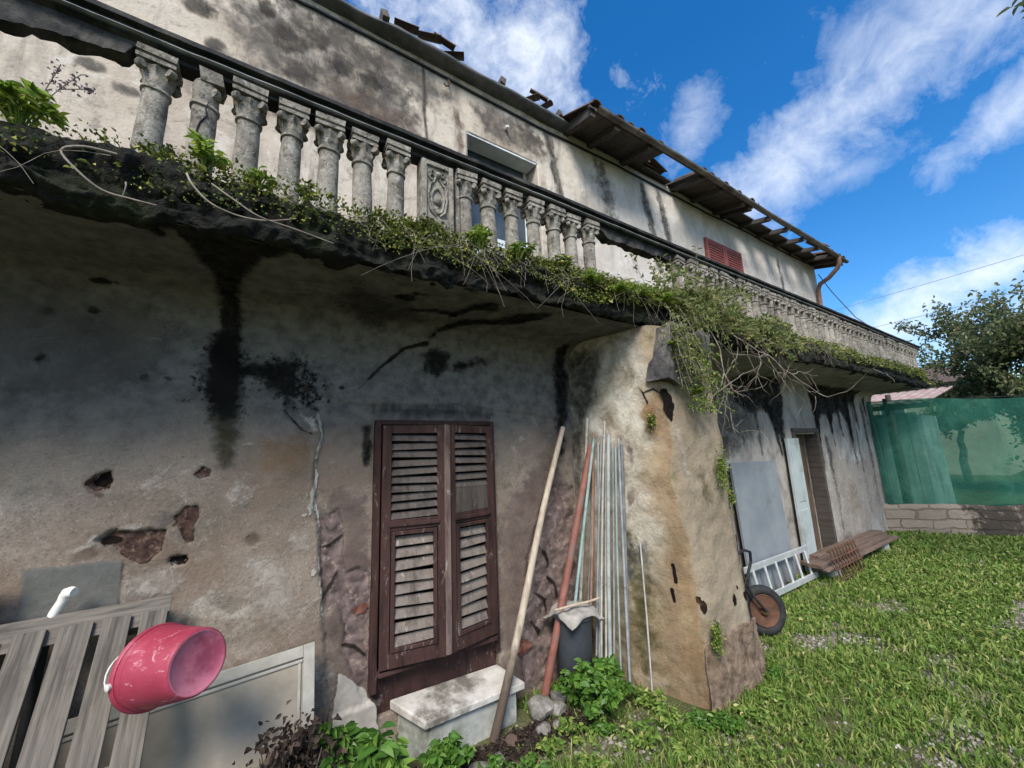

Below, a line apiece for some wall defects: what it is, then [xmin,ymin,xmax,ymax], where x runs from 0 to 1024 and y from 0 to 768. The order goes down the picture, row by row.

leakage [184,0,216,17]
leakage [232,0,448,135]
leakage [640,183,671,242]
leakage [150,222,333,466]
spalling [85,471,113,495]
spalling [73,505,199,563]
peeling [243,556,292,623]
crack [287,413,324,623]
peeling [289,490,371,693]
peeling [499,457,579,689]
leakage [713,374,786,455]
leakage [808,383,880,527]